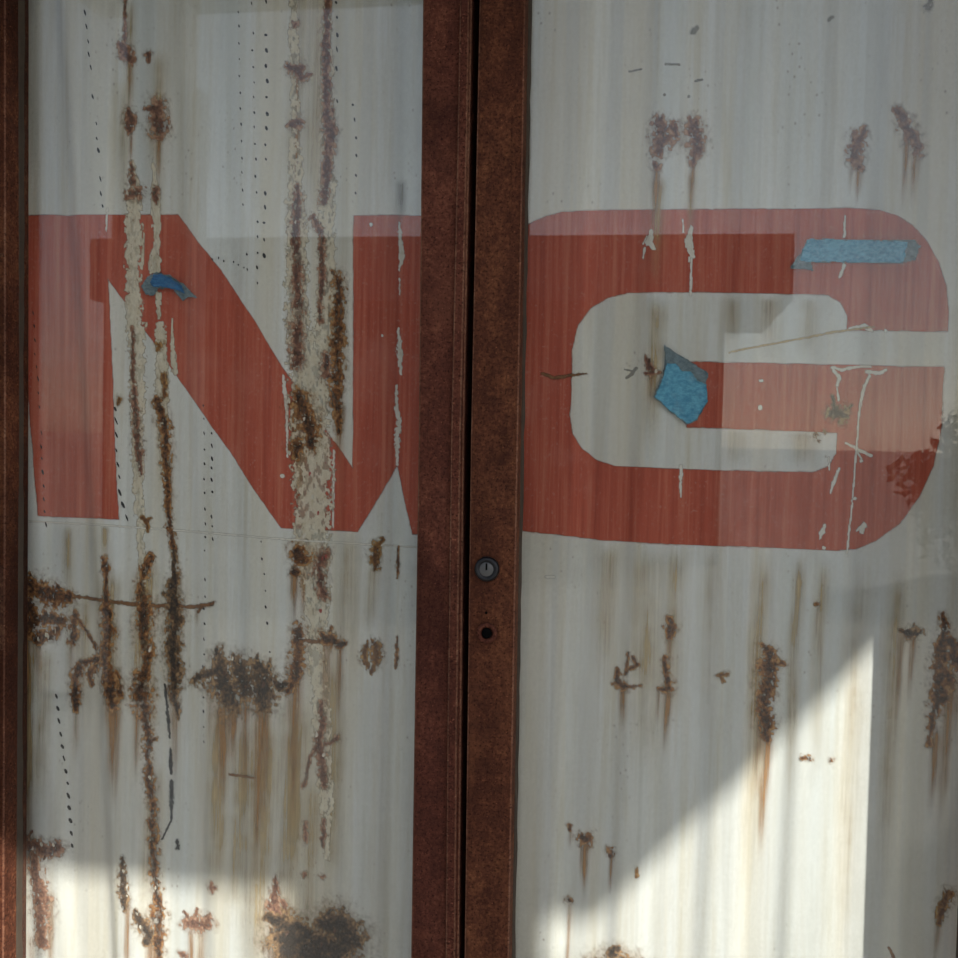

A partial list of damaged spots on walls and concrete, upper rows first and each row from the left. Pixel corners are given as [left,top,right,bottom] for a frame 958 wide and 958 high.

rust [116,0,154,89]
rust [123,94,172,205]
rust [646,113,707,210]
rust [844,125,869,188]
rust [284,0,348,462]
rust [27,325,348,958]
rust [611,651,642,712]
rust [657,655,676,730]
rust [755,642,787,816]
rust [898,611,958,787]
rust [261,876,370,958]
rust [594,945,632,958]